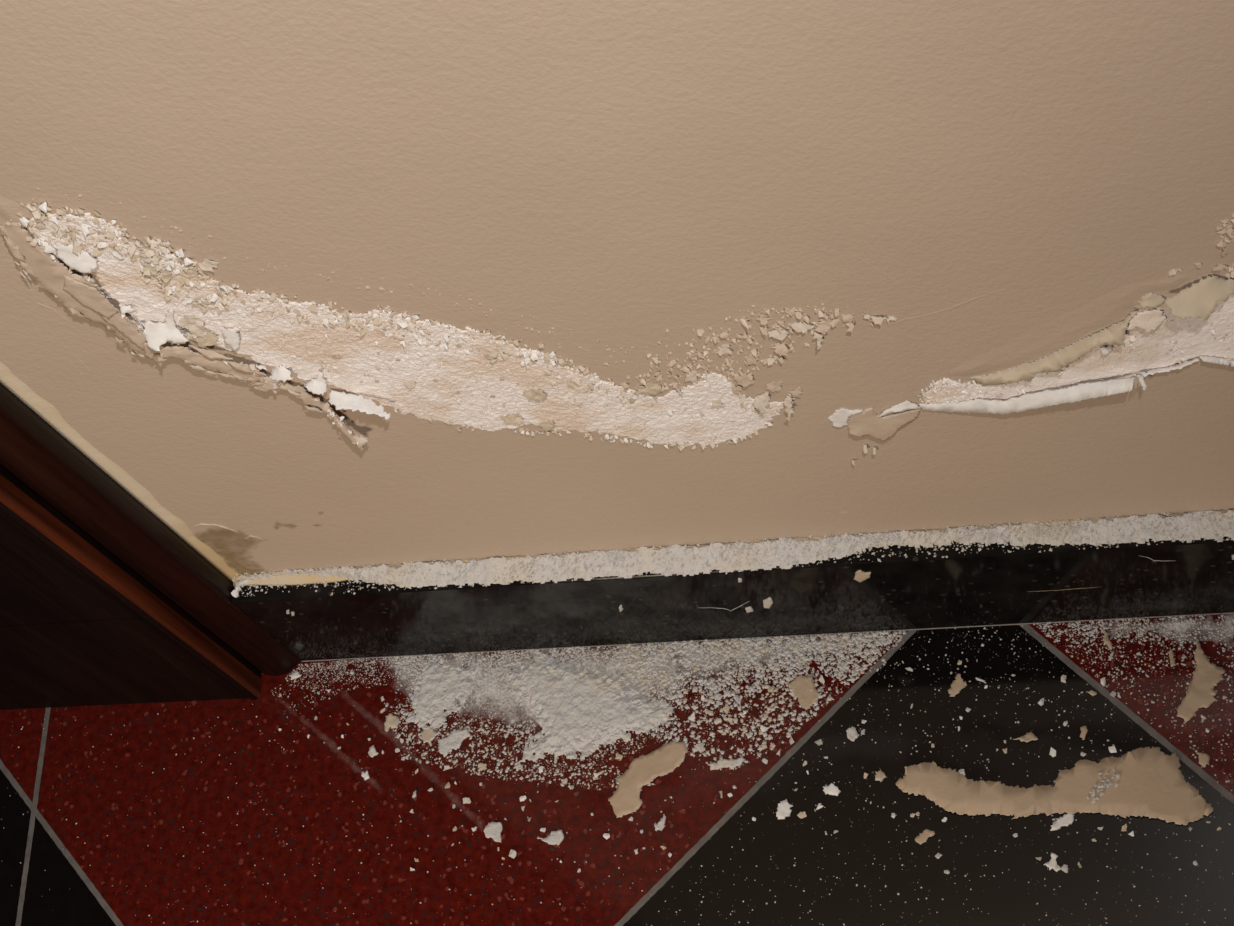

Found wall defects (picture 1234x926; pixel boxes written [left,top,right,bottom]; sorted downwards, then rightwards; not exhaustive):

flaking render [0,187,784,451]
peeling [828,275,1234,466]
peeling [854,570,871,583]